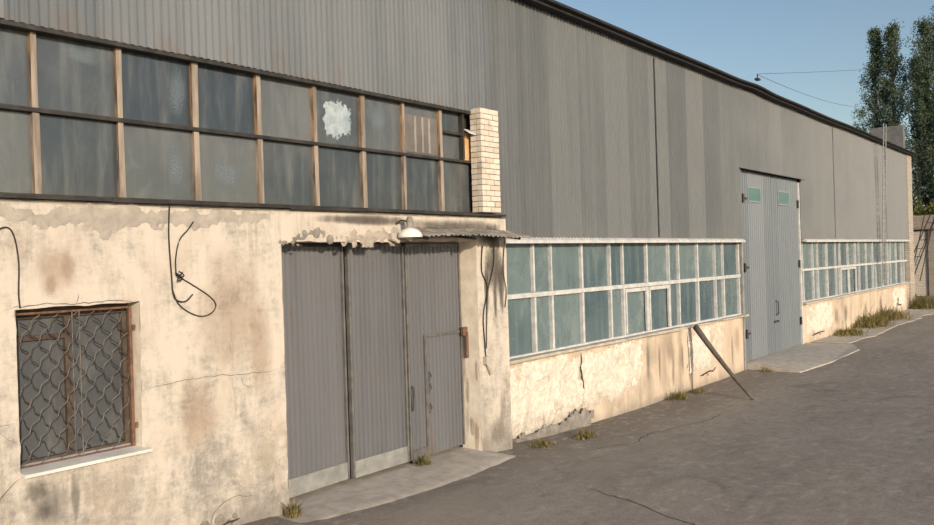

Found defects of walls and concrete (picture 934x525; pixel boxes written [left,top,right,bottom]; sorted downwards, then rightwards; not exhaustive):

flaking render [0,202,271,241]
spalling [278,227,399,248]
spalling [806,302,833,335]
spalling [687,321,725,374]
spalling [510,339,643,442]